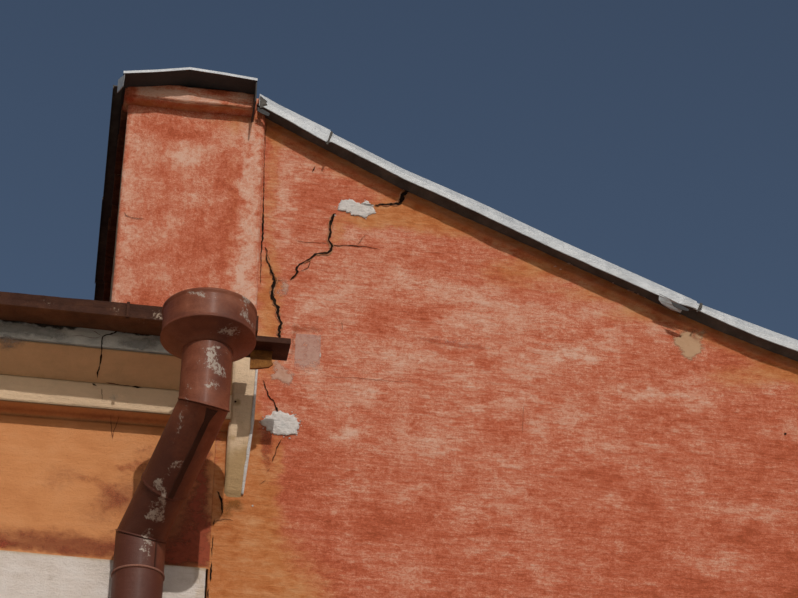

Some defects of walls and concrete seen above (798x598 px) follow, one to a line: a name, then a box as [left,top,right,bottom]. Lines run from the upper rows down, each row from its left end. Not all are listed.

crack [361,189,409,207]
crack [260,131,377,337]
crack [75,331,143,394]
spalling [673,330,704,360]